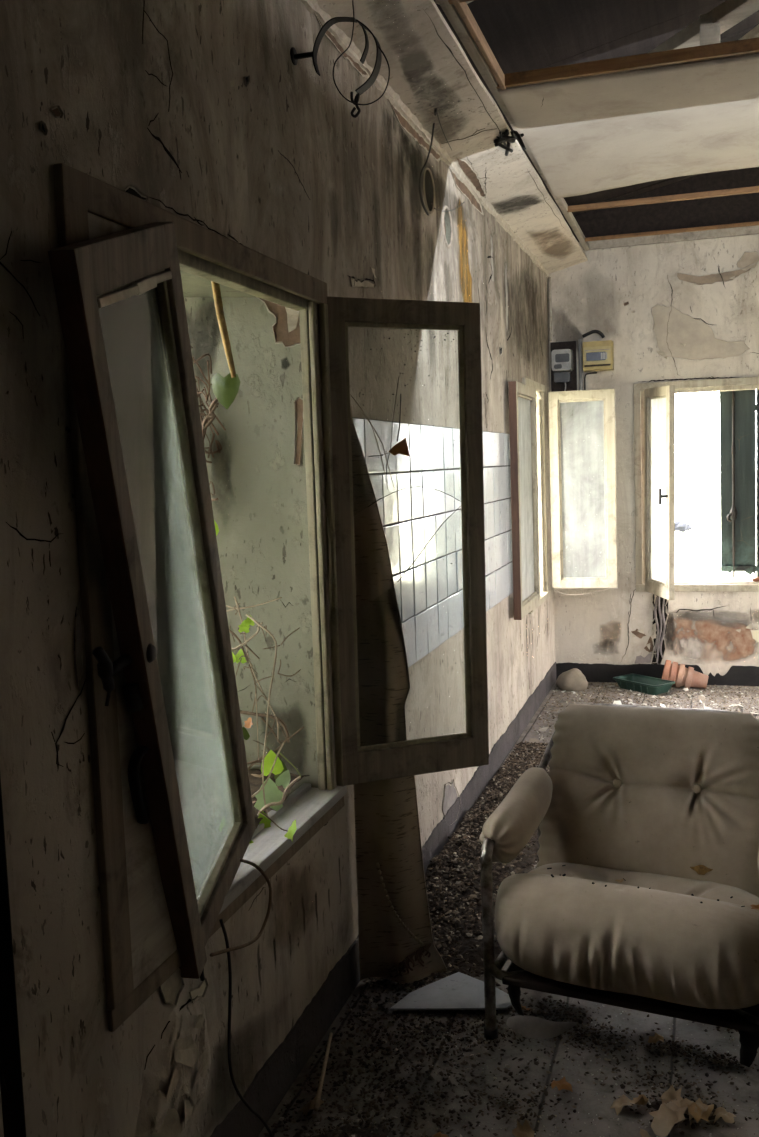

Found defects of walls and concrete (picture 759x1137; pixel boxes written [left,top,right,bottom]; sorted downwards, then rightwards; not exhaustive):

crack [142,3,189,178]
damp [376,0,457,139]
crack [149,197,243,245]
damp [532,230,572,256]
crack [642,275,740,382]
peeling [736,624,759,642]